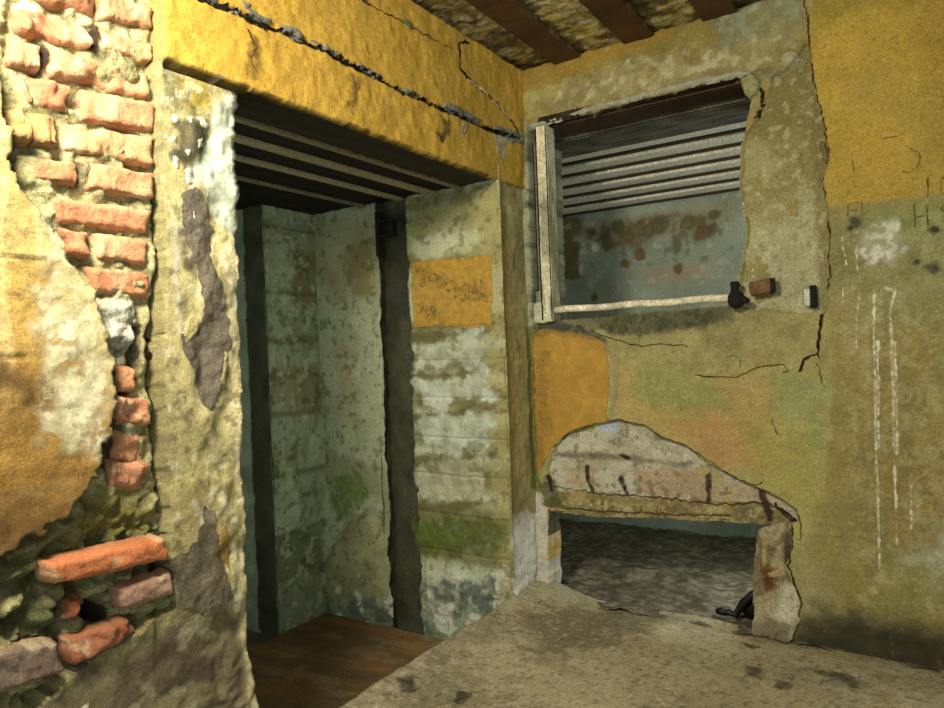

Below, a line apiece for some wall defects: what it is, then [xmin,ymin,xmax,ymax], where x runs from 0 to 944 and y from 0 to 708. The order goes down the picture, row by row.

crack [198,0,524,145]
crack [803,0,832,289]
flaking render [0,0,237,708]
crack [591,330,689,347]
spalling [532,328,803,642]
crack [696,312,825,386]
damp [872,286,899,569]
damp [900,534,944,583]